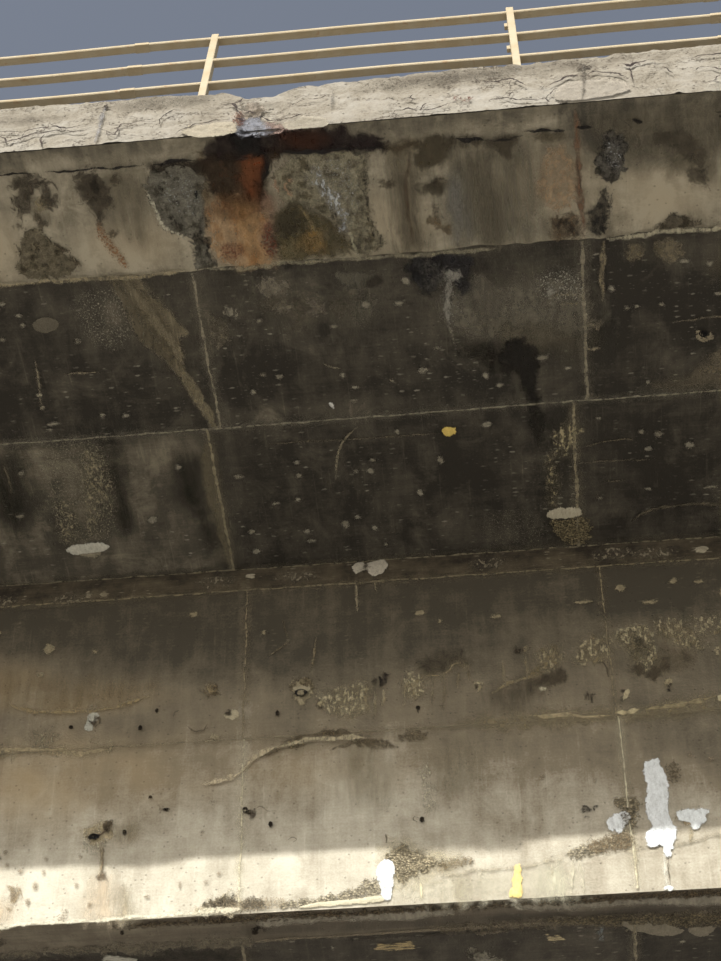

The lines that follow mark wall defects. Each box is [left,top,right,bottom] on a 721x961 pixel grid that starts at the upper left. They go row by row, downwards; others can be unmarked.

spalling [8,174,82,280]
spalling [72,167,129,269]
spalling [142,161,219,271]
rust [198,125,389,268]
spalling [551,129,630,241]
leakage [0,271,217,428]
leakage [465,337,584,506]
spalling [192,889,266,917]